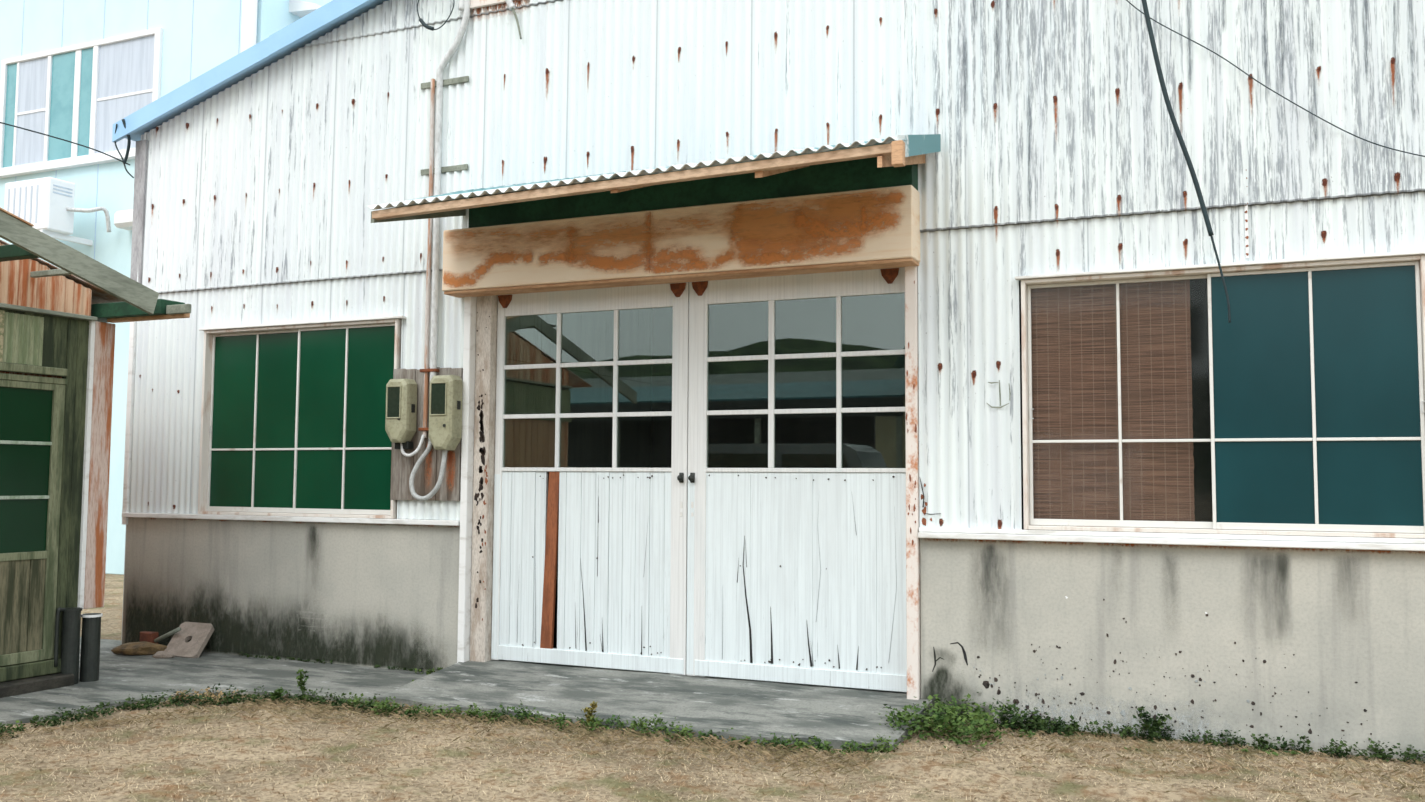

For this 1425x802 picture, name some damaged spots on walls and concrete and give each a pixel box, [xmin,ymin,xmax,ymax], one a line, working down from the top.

rust [471,0,530,17]
water stain [995,0,1011,86]
water stain [1393,0,1415,114]
peeling [474,394,488,553]
water stain [1261,556,1288,587]
water stain [1009,703,1223,742]